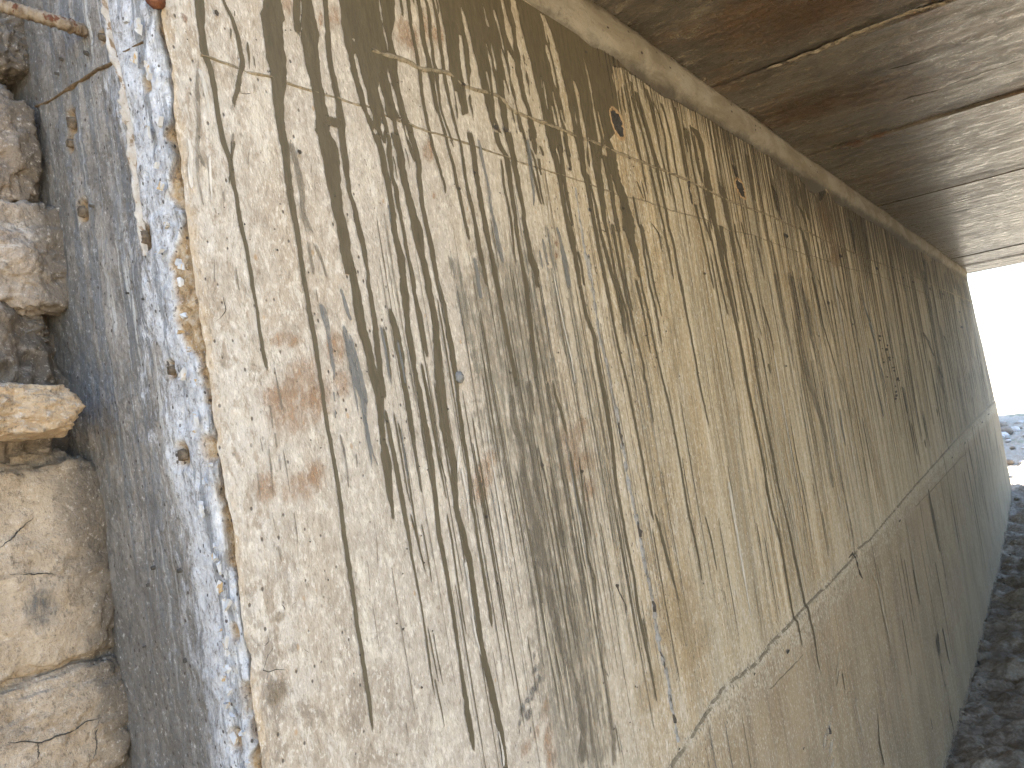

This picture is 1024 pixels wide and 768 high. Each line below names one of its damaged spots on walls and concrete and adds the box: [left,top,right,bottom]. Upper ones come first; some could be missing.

damp [188,0,290,491]
damp [222,0,1006,768]